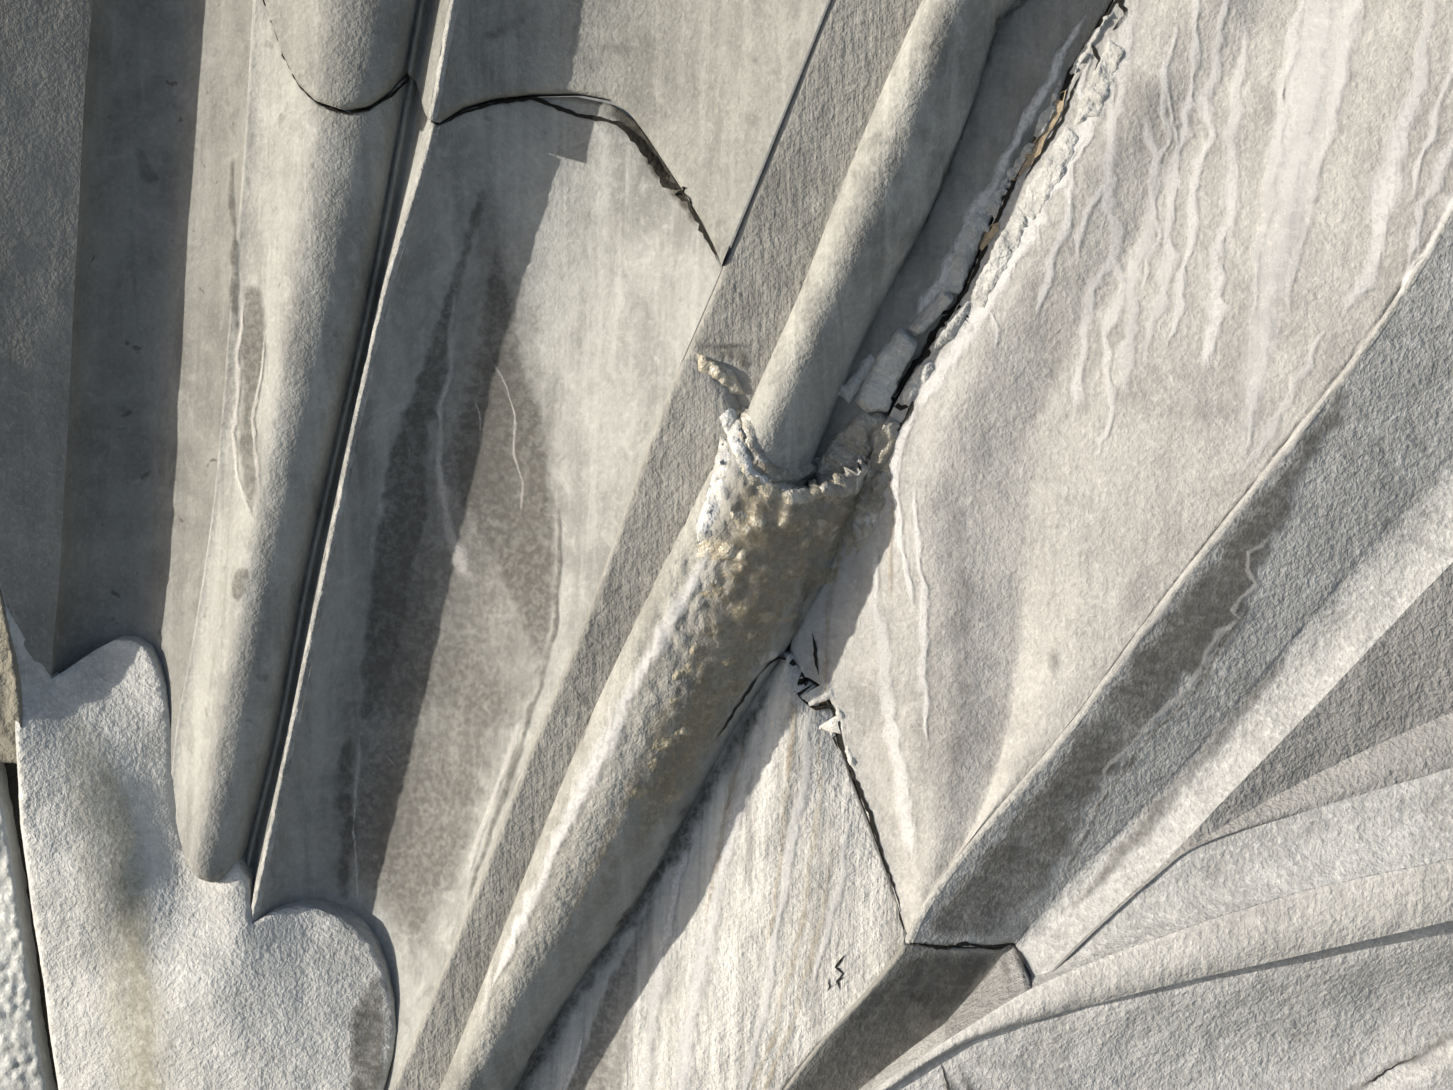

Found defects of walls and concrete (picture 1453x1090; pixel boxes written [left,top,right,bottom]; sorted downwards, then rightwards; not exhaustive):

crack [263,0,409,115]
crack [437,97,717,257]
peeling [838,9,1126,413]
efflorescence [1344,0,1453,310]
water stain [365,290,561,804]
water stain [481,0,1247,1090]
water stain [935,0,1364,932]
water stain [338,745,456,914]
water stain [470,681,542,890]
crack [716,633,1021,972]